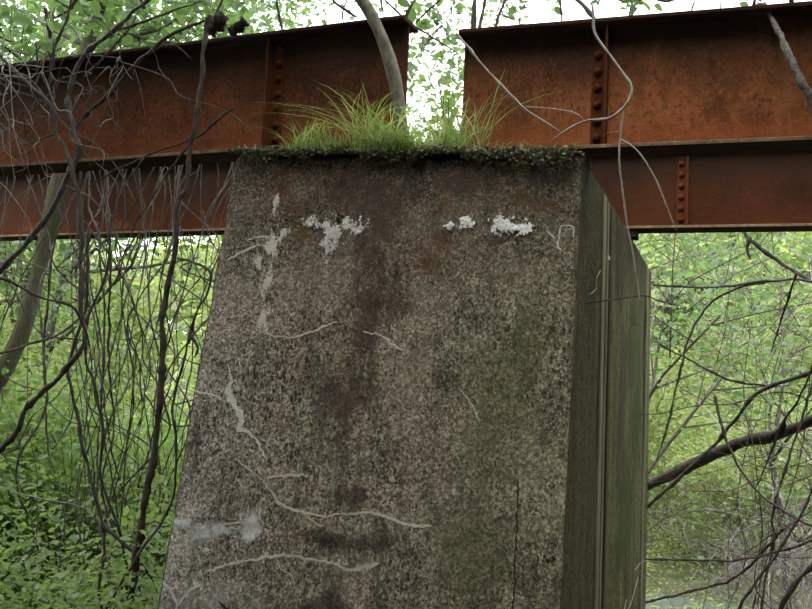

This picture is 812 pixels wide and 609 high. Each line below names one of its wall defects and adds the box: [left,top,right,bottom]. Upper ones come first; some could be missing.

peeling [301,213,372,267]
peeling [443,212,532,237]
crack [511,481,519,609]